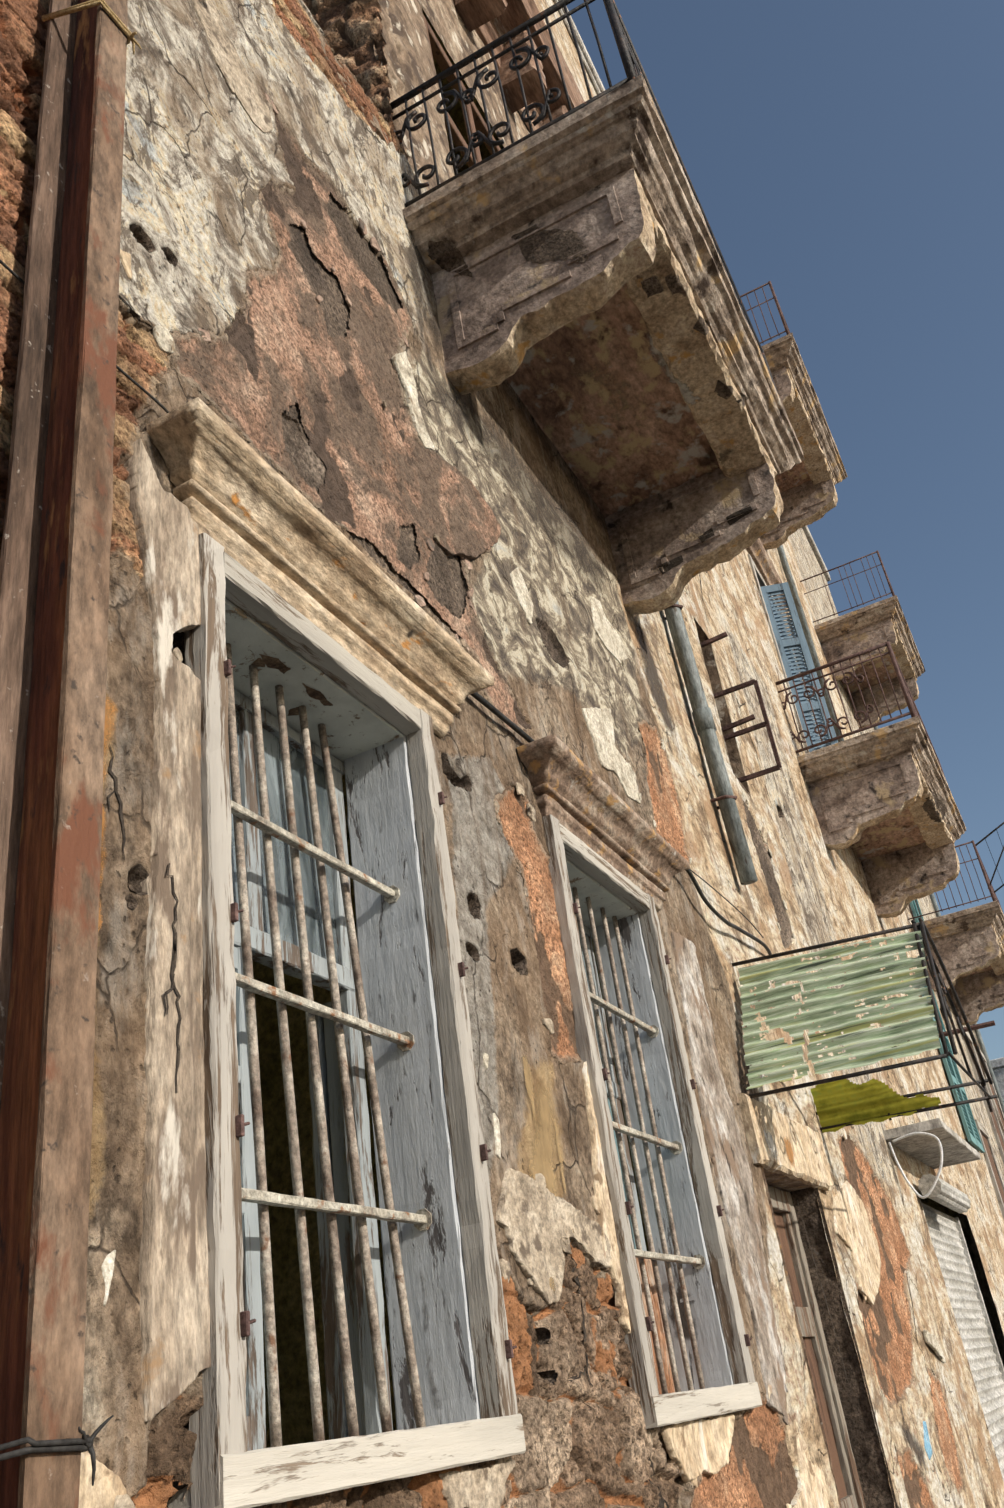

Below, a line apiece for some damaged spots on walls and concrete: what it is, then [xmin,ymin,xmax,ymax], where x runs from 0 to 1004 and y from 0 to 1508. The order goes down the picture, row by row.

flaking render [0,0,50,555]
flaking render [110,0,534,735]
crack [107,744,126,860]
flaking render [78,1373,204,1508]
crack [165,863,182,1093]
flaking render [252,782,829,1508]
flaking render [832,1128,963,1495]
flaking render [894,1447,936,1508]